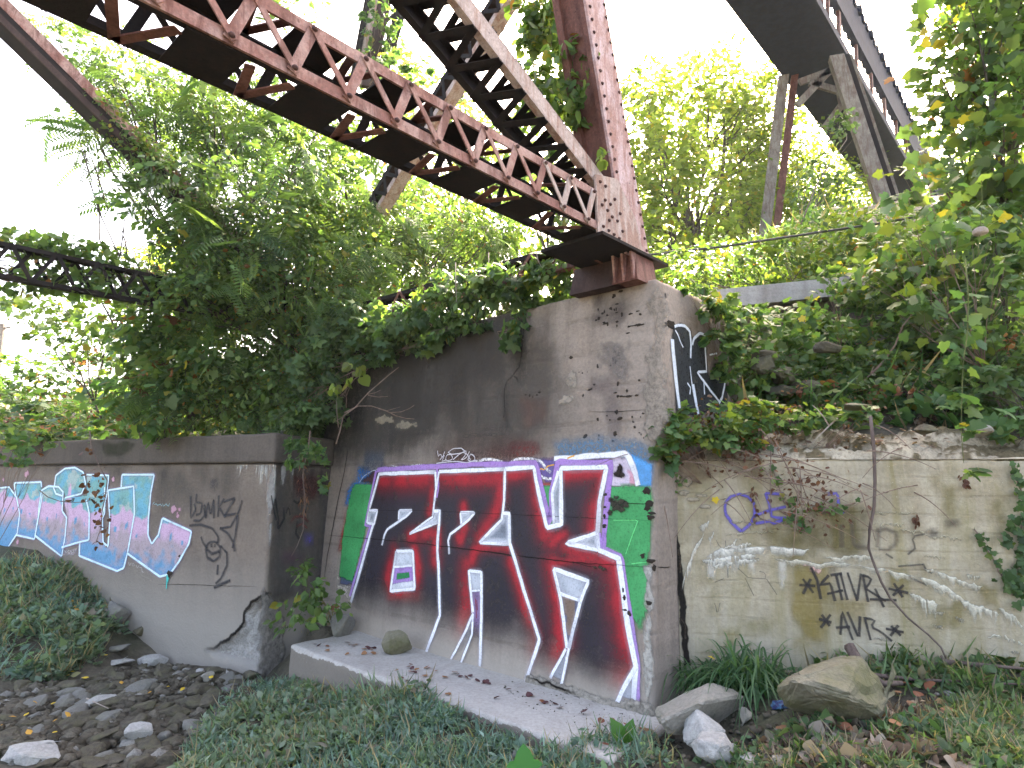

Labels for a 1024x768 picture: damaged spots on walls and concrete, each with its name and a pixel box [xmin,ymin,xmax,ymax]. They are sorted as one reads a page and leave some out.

spalling [214,588,286,678]
crack [659,536,691,665]
damp [682,506,1022,629]